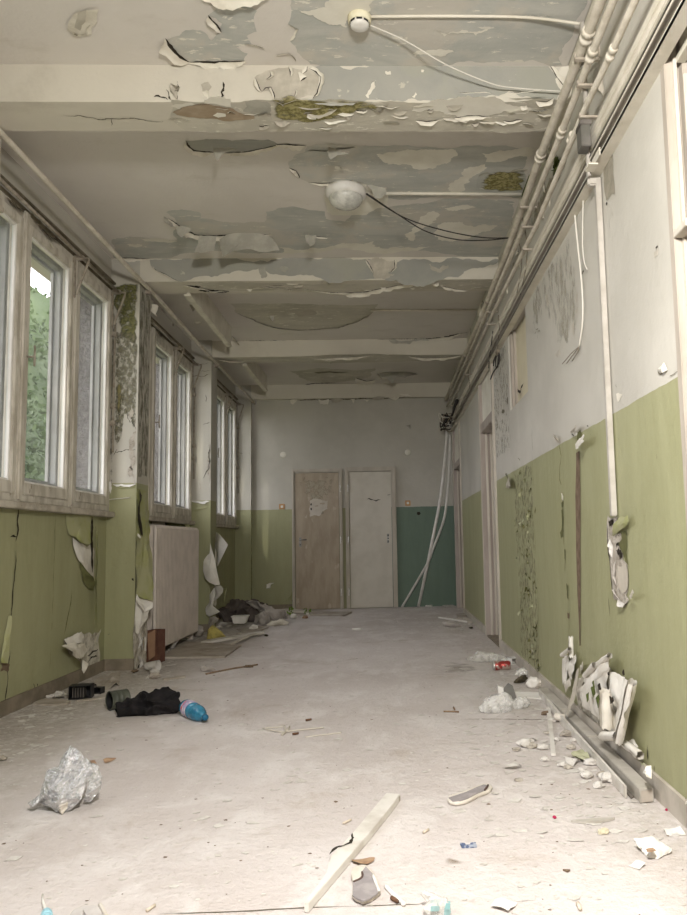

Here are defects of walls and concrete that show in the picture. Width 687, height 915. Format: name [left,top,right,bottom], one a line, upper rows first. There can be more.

peeling [111,0,587,330]
mould [479,169,530,197]
mould [110,292,150,476]
peeling [63,514,101,673]
peeling [109,431,190,669]
peeling [203,532,228,628]
flaking render [607,516,634,613]
peeling [560,636,652,779]